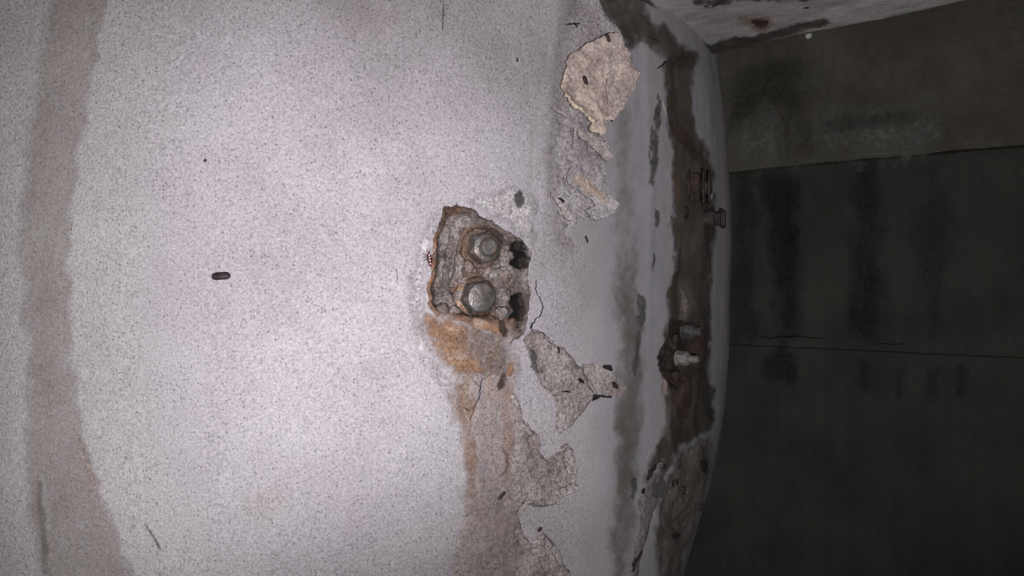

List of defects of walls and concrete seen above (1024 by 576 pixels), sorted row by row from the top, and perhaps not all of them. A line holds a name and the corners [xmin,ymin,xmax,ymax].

peeling [549,0,640,249]
leakage [22,0,123,576]
corrosion [425,316,519,509]
peeling [409,187,626,576]
crack [509,280,554,344]
spalling [628,439,712,576]
leakage [599,0,829,564]